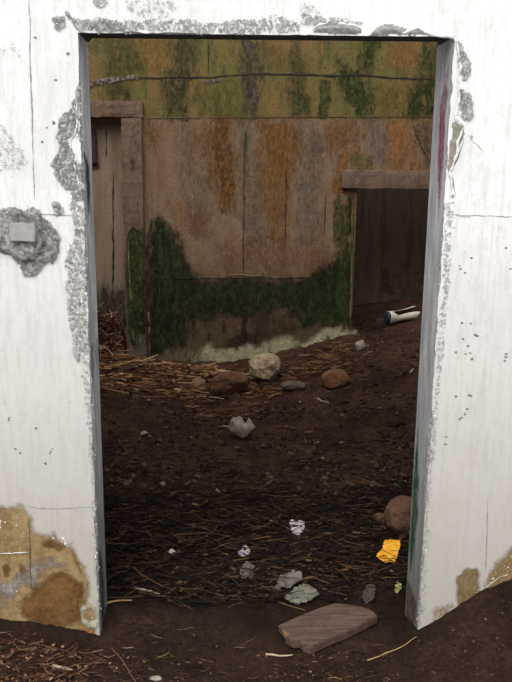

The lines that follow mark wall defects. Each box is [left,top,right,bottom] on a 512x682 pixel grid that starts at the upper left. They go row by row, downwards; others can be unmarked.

peeling [51,0,363,35]
corrosion [202,114,236,214]
corrosion [256,120,303,244]
spalling [0,85,102,613]
water stain [159,259,356,363]
spalling [416,40,474,624]
crack [28,506,99,579]